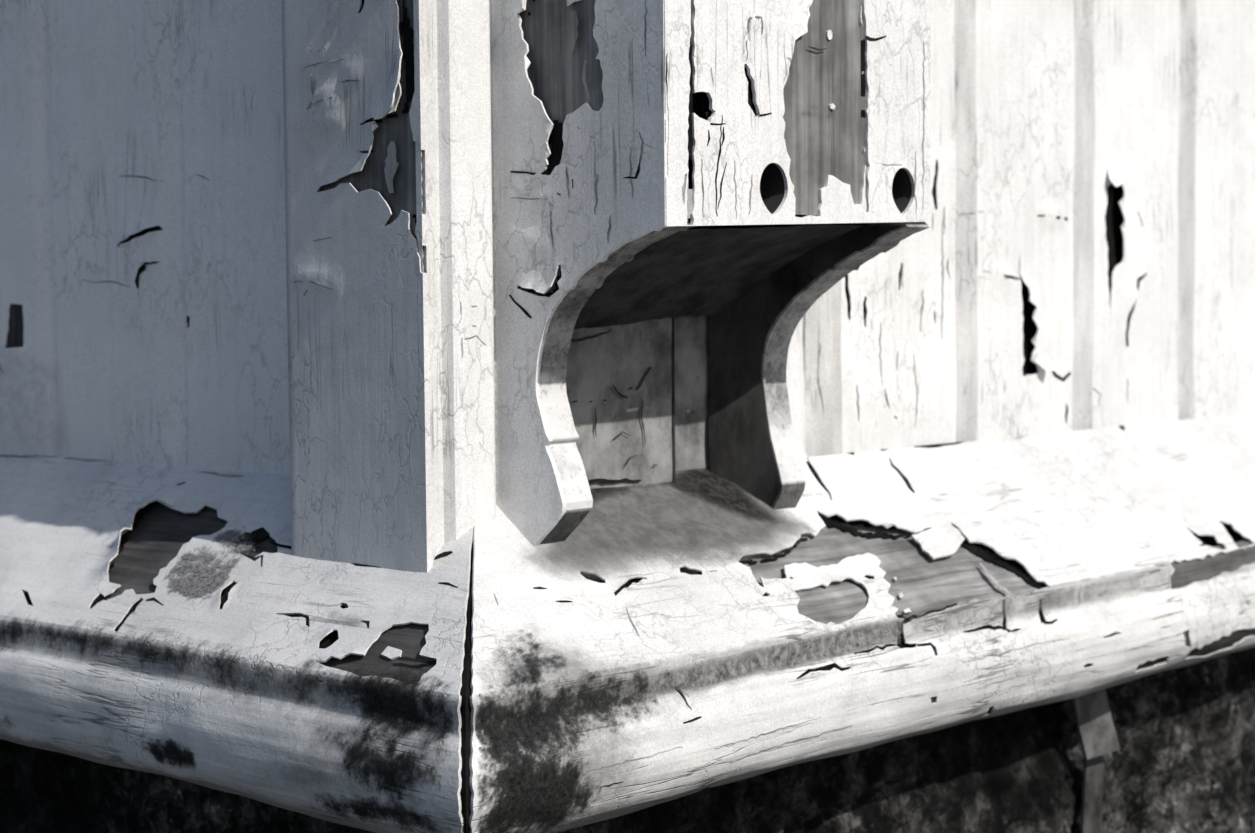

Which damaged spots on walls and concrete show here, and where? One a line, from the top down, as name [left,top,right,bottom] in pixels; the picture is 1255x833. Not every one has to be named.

peeling [519,0,604,175]
peeling [783,0,867,215]
water stain [0,618,239,684]
water stain [145,738,195,769]
peeling [91,502,277,632]
crack [246,527,292,549]
water stain [287,661,453,833]
peeling [319,606,437,681]
crack [434,540,498,833]
crack [533,573,641,635]
water stain [476,621,901,833]
peeling [739,513,1047,624]